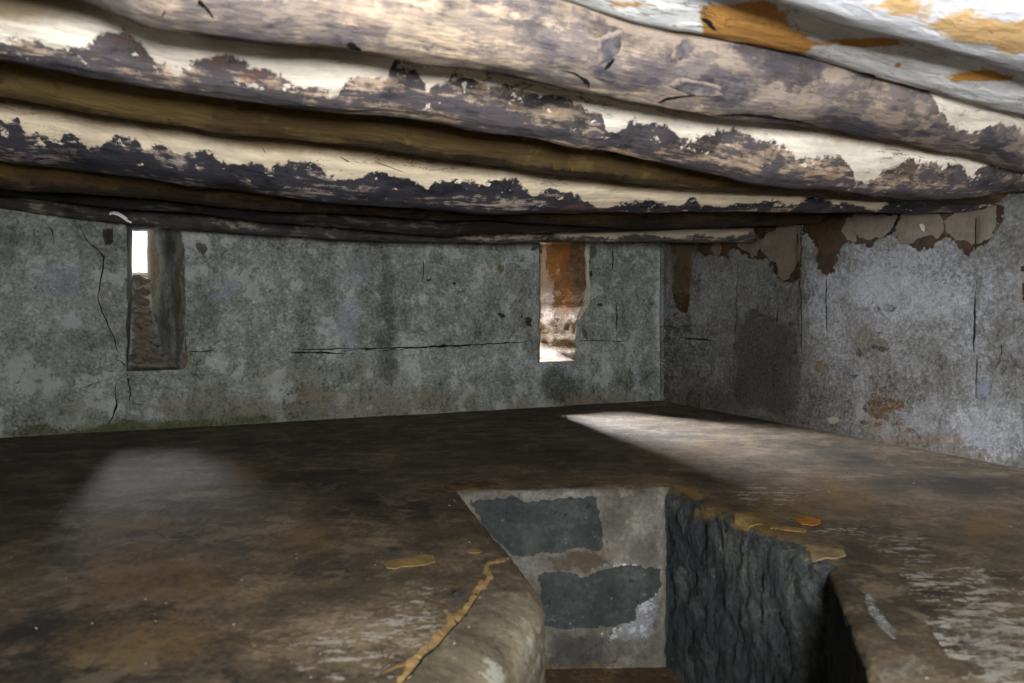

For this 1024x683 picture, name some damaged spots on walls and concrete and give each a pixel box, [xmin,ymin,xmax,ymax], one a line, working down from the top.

flaking render [698,204,1004,282]
crack [80,228,143,424]
crack [290,341,528,354]
corrosion [860,386,915,433]
crack [371,556,512,683]
spalling [418,478,965,683]